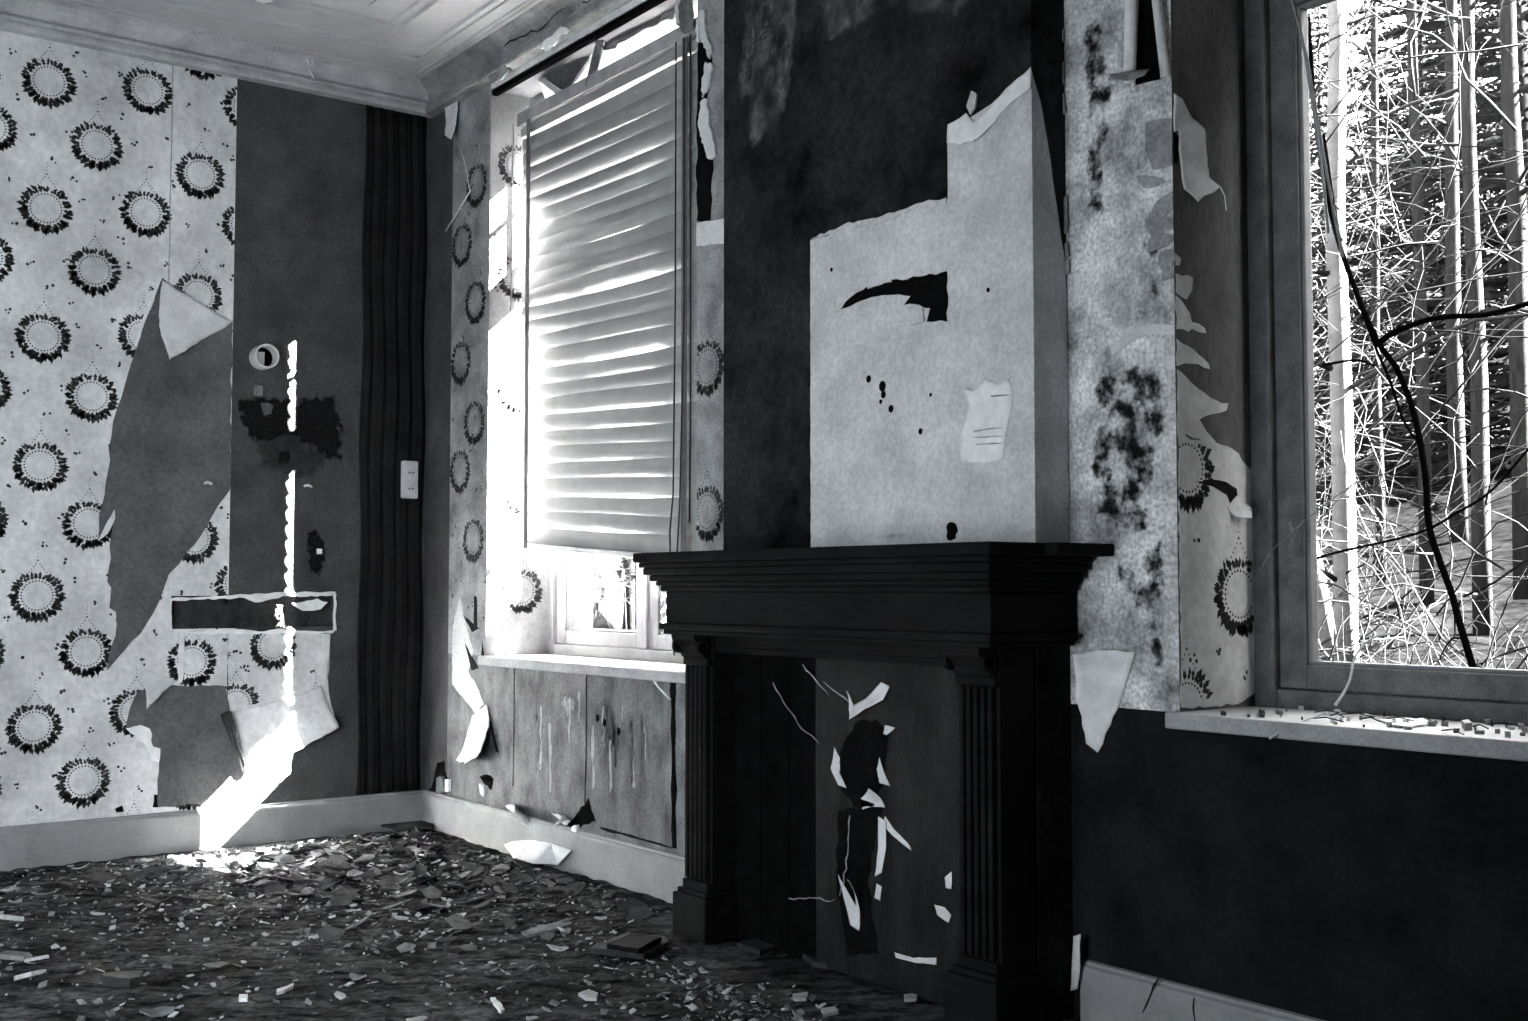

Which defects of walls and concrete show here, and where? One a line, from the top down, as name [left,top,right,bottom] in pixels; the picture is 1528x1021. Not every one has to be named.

leakage [1084,24,1111,106]
leakage [1087,124,1108,212]
flaking render [810,89,1036,547]
leakage [1092,367,1163,531]
flaking render [98,278,337,807]
leakage [1118,542,1163,666]